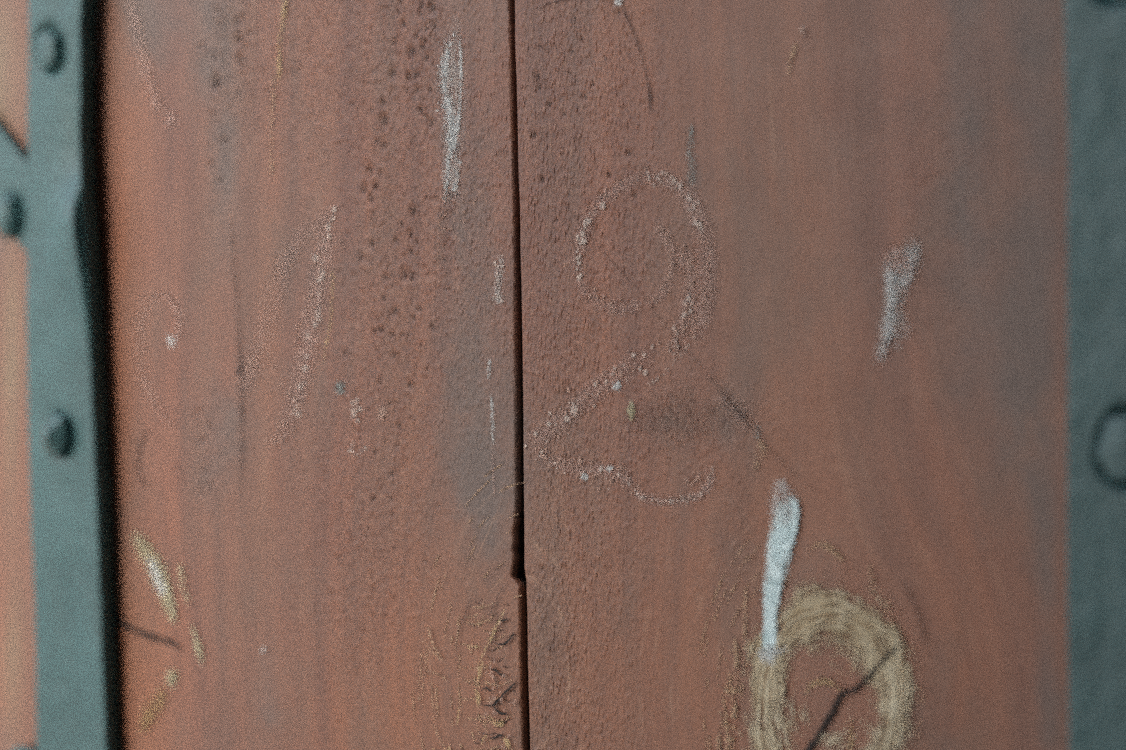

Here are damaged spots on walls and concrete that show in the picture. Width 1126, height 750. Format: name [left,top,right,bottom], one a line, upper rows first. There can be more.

crack [805,643,901,750]